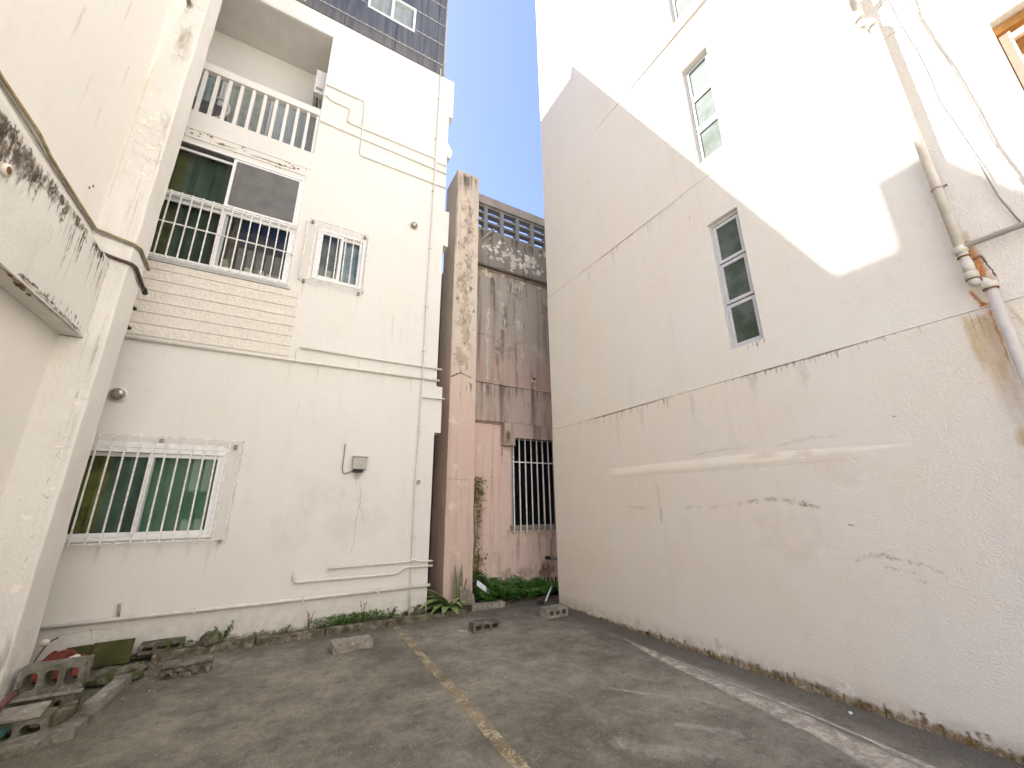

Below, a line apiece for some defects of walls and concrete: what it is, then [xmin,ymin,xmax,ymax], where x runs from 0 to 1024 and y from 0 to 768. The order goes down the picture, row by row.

leakage [0,111,104,274]
peeling [452,200,547,369]
leakage [485,284,521,397]
corrosion [957,247,1000,308]
leakage [561,604,1024,764]